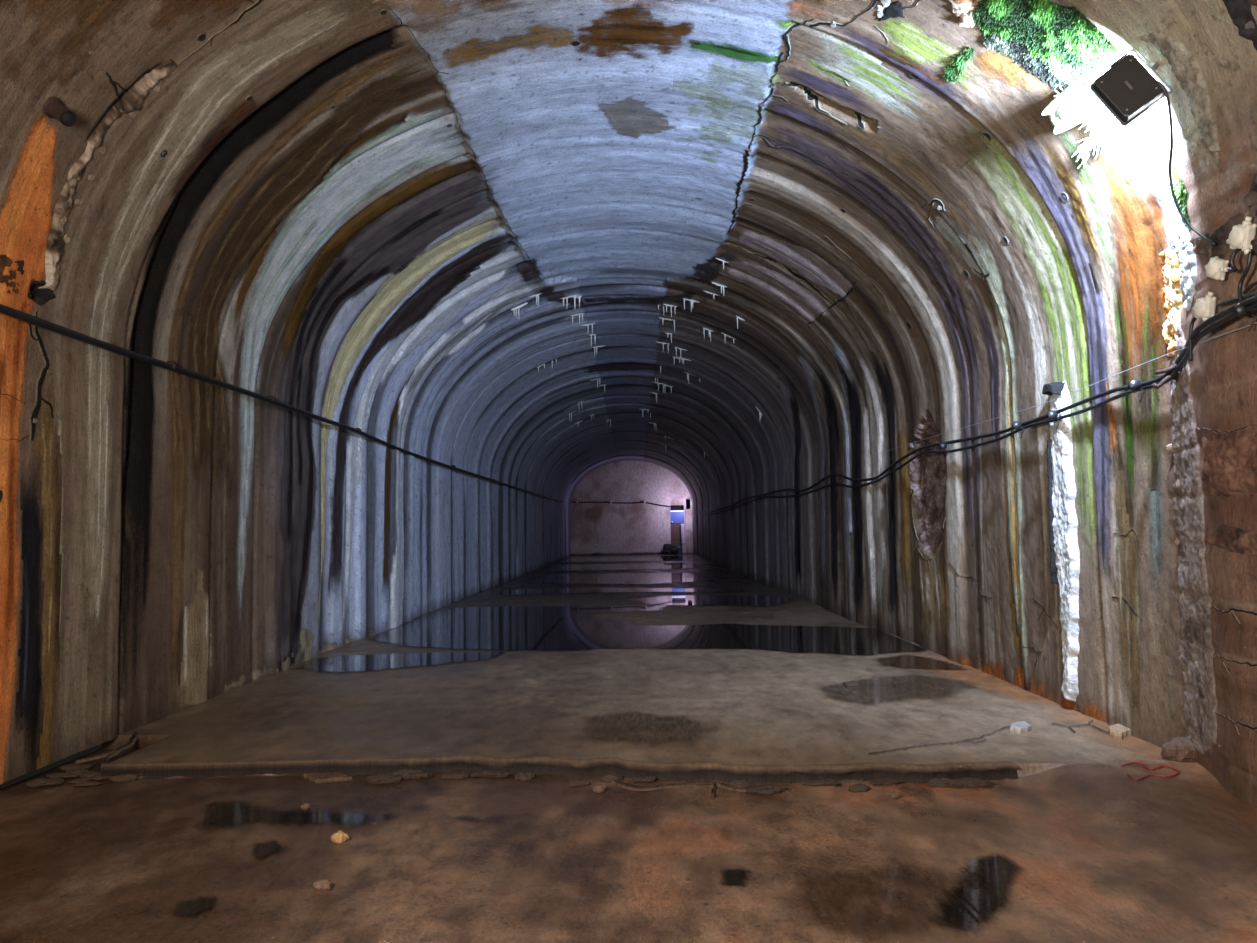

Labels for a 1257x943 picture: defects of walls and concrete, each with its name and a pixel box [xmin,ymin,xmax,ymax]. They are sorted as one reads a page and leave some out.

rust [0,118,56,784]
leakage [15,396,63,769]
spalling [15,59,177,306]
crack [177,0,262,66]
leakage [83,0,853,706]
crack [726,0,920,326]
spalling [910,409,946,555]
crack [921,198,945,227]
leakage [995,133,1161,712]
rust [1105,156,1167,400]
spalling [1159,170,1257,754]
spalling [1222,0,1257,50]